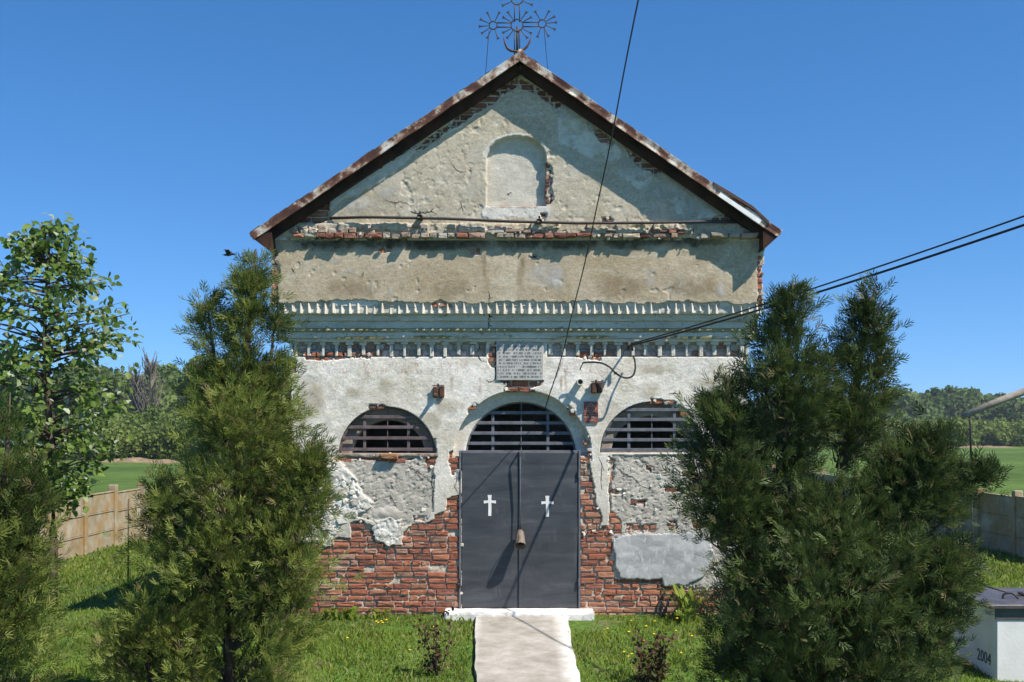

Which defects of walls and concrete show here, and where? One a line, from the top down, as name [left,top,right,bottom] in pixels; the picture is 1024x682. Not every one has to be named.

flaking render [416,76,564,150]
flaking render [540,163,554,221]
flaking render [755,252,765,307]
flaking render [303,352,373,361]
flaking render [577,352,602,361]
flaking render [292,435,464,615]
flaking render [580,435,727,615]